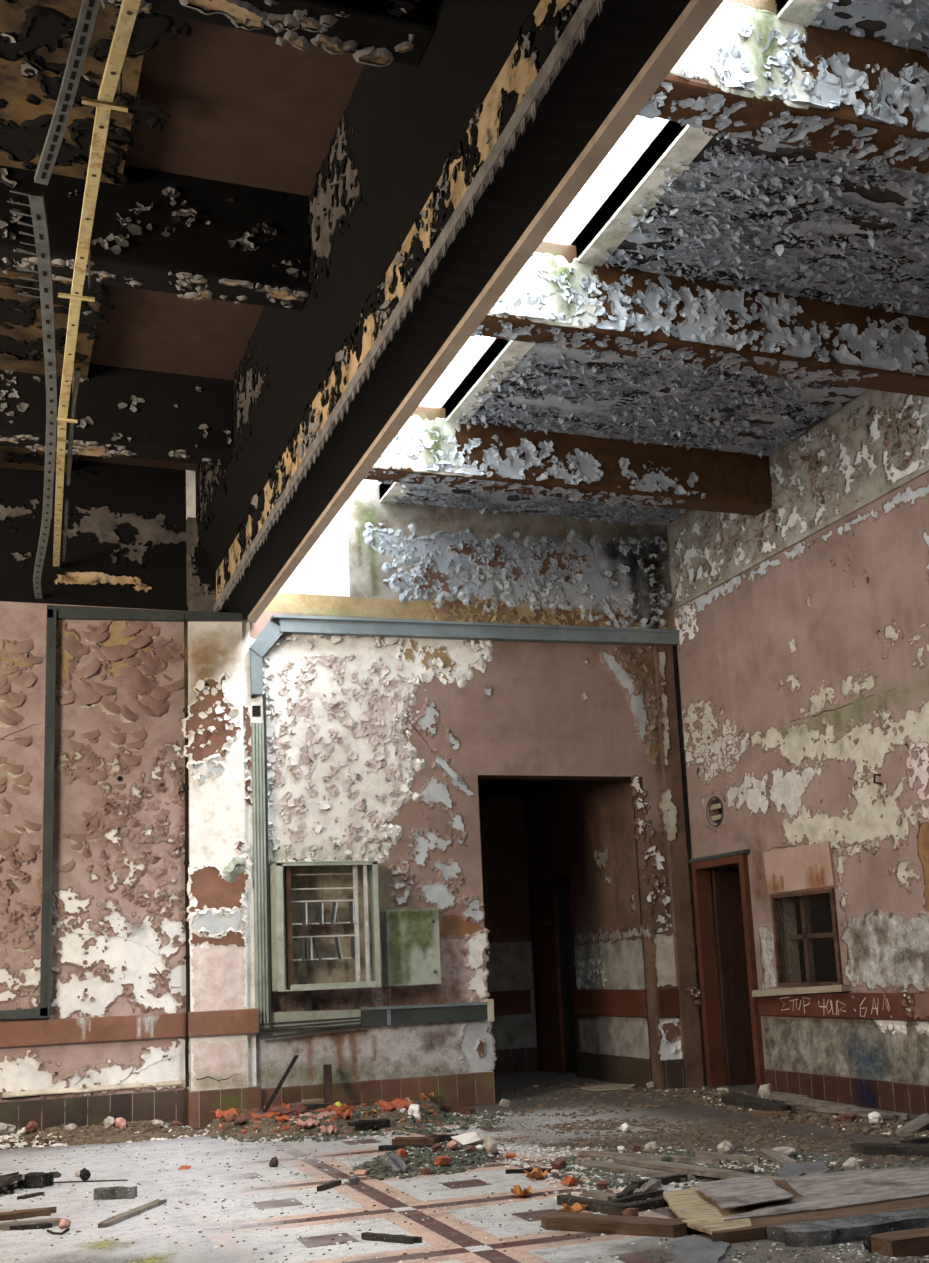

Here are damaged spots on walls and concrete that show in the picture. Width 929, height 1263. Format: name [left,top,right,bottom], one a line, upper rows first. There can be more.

peeling [137,0,152,14]
peeling [179,0,415,67]
peeling [251,346,354,524]
mould [610,542,663,626]
peeling [361,0,929,1085]
peeling [0,634,494,1019]
peeling [0,1037,248,1100]